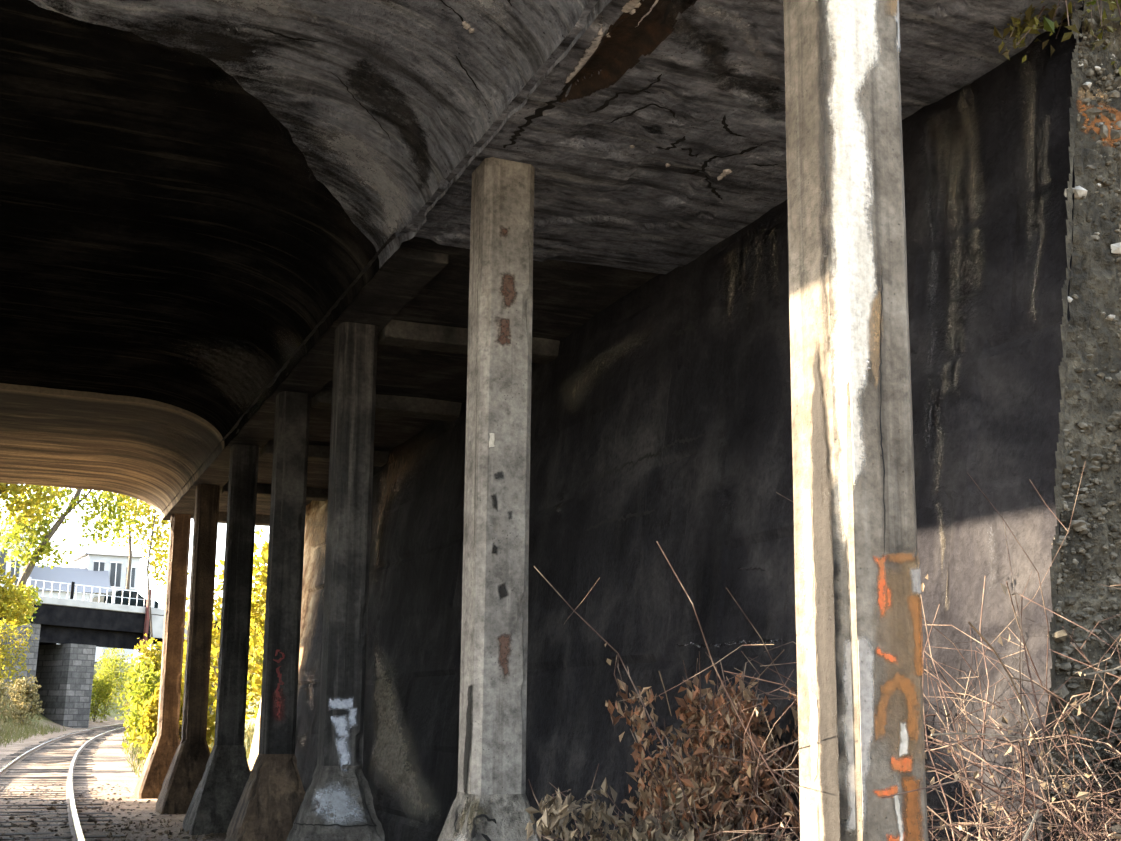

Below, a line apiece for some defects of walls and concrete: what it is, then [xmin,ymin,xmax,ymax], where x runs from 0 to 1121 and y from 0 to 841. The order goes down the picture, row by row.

spalling [559,0,697,103]
crack [503,84,568,148]
crack [588,74,778,200]
water stain [1003,55,1051,317]
corrosion [1078,88,1121,147]
corrosion [495,273,517,346]
water stain [825,0,879,542]
water stain [923,90,983,603]